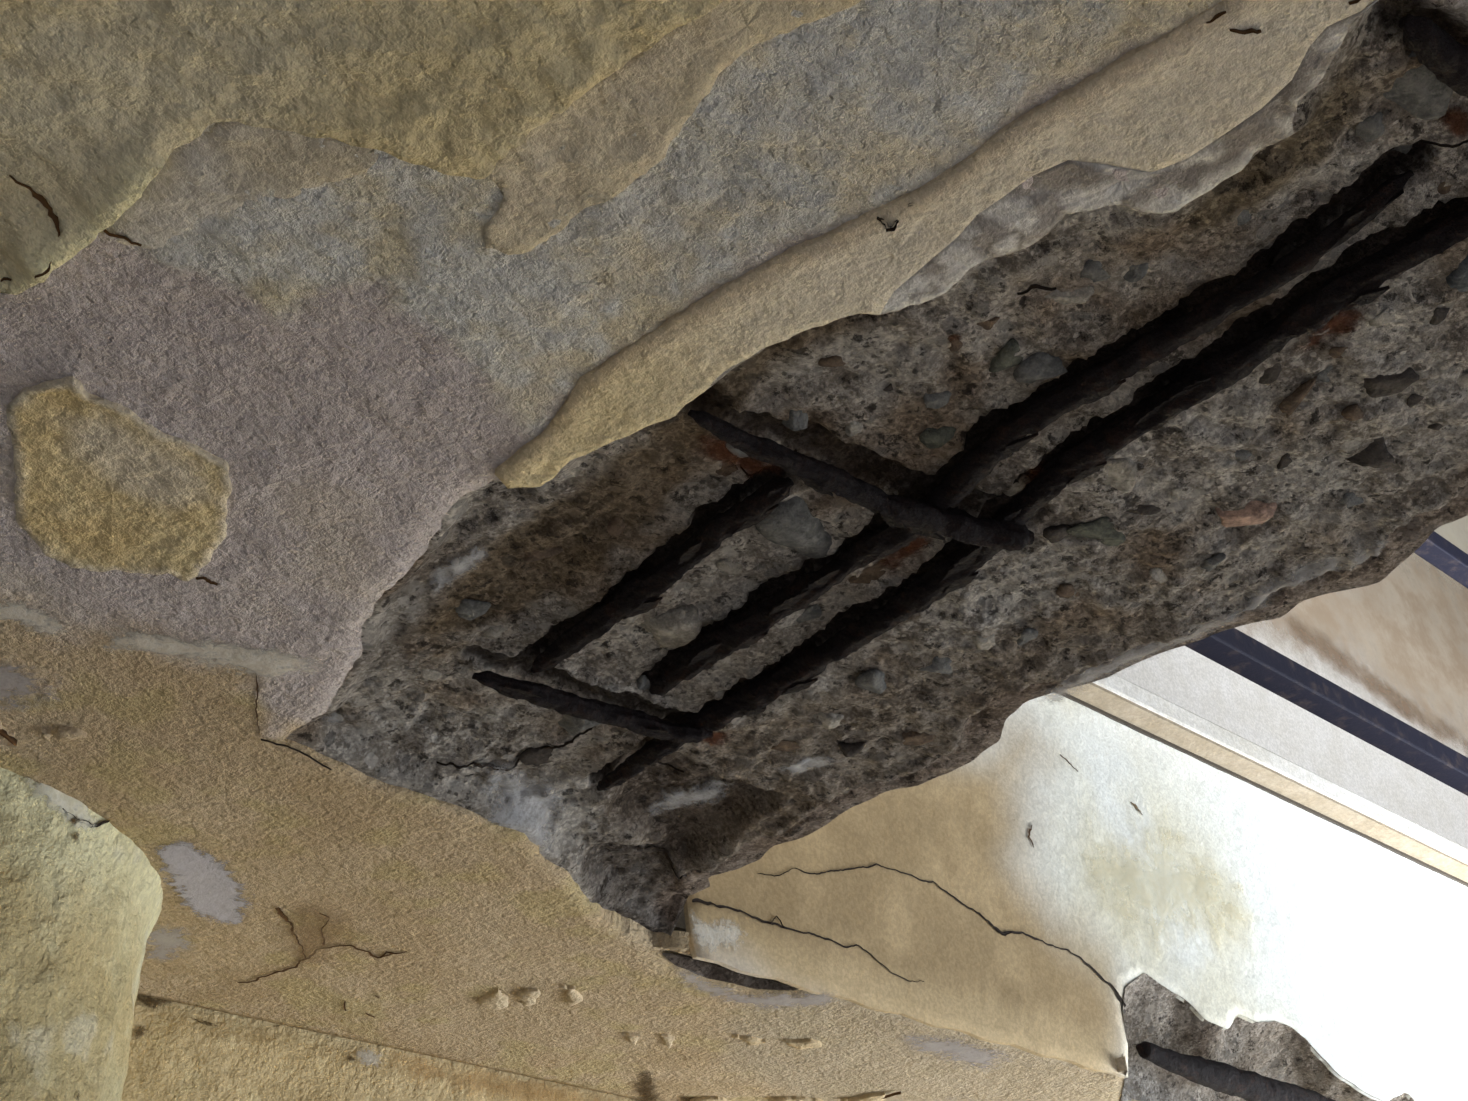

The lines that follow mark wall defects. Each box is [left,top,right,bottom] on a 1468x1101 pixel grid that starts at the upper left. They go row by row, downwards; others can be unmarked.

rust [1399,14,1468,141]
peeling [0,0,861,295]
peeling [6,376,232,581]
spalling [285,0,1468,1010]
rust [472,170,1468,791]
peeling [158,841,253,924]
crack [237,907,407,983]
crack [692,898,924,982]
crack [758,863,1126,1008]
rust [1136,1041,1336,1101]
spalling [1120,973,1415,1101]